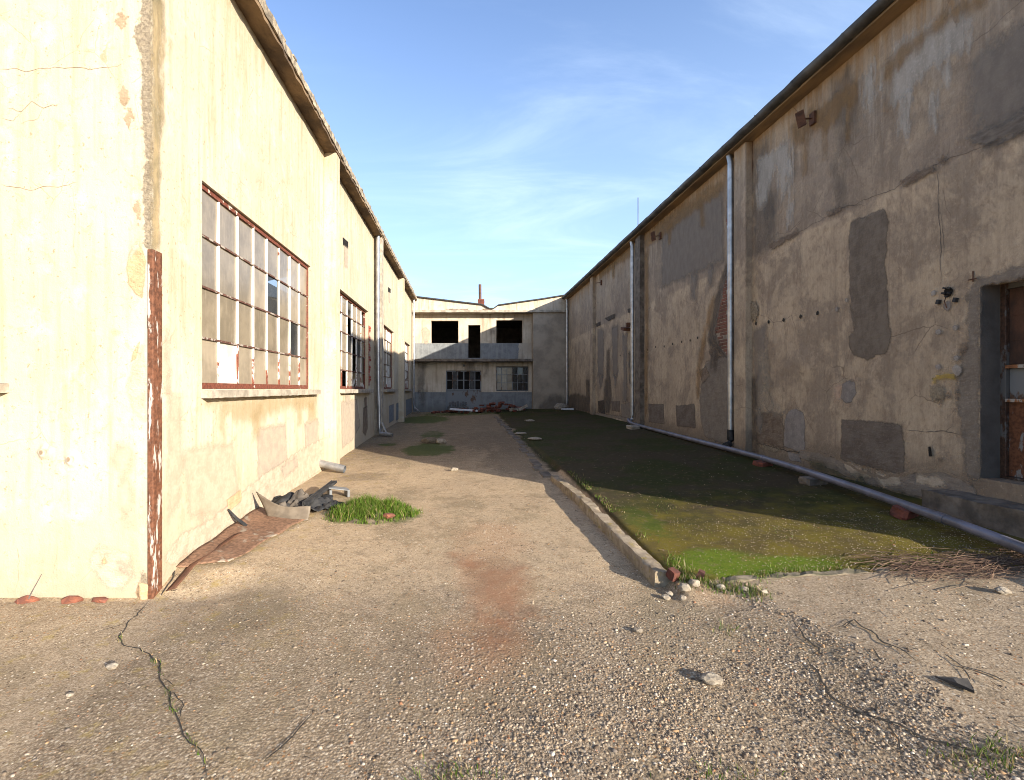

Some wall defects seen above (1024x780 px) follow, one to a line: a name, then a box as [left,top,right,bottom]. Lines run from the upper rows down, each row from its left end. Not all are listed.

spalling [115,0,153,298]
crack [931,145,993,270]
flaking render [714,273,727,358]